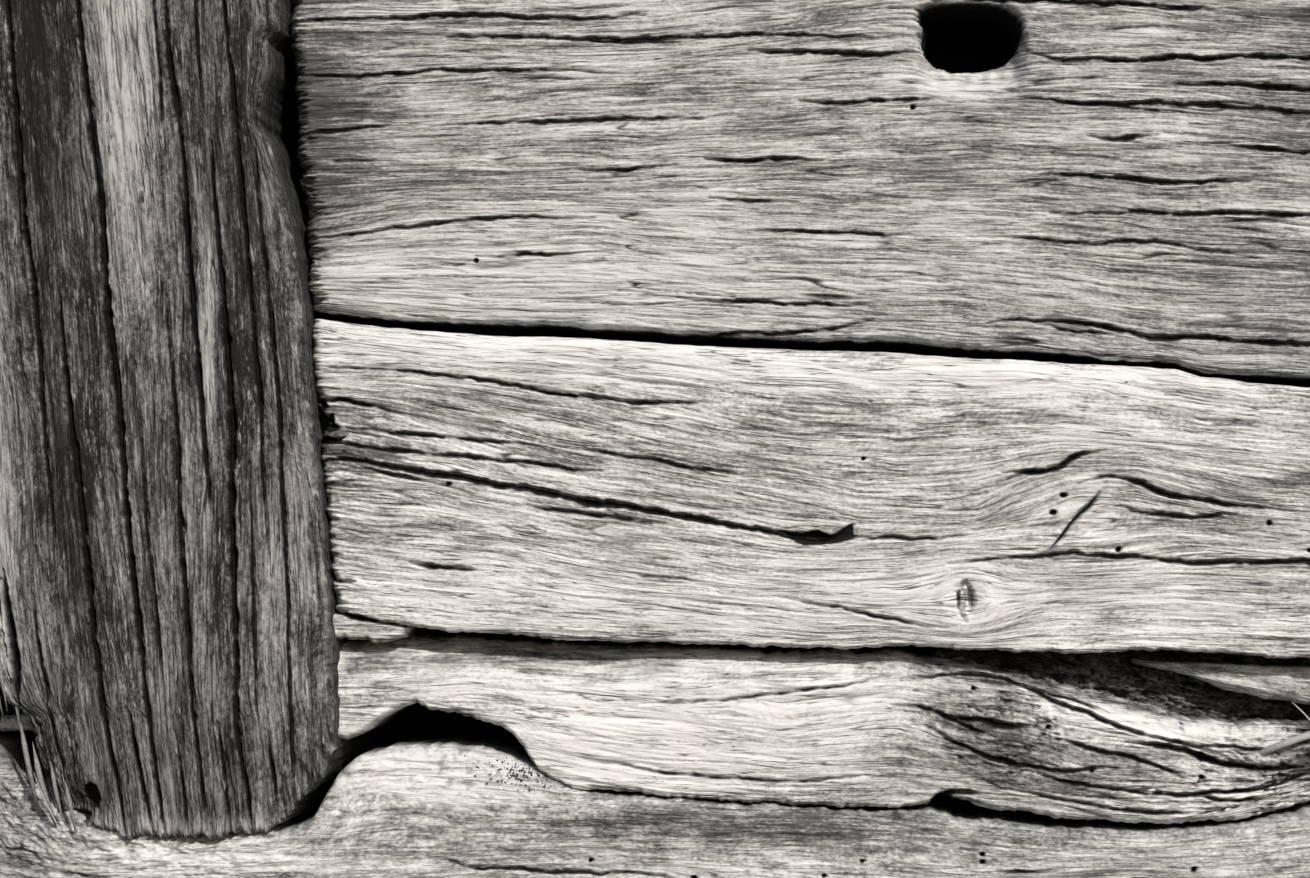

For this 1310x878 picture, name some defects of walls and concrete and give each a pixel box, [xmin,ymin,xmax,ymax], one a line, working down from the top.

crack [0,0,294,822]
crack [421,562,463,570]
crack [325,367,835,539]
crack [868,534,944,542]
crack [965,452,1310,565]
crack [670,672,1307,814]